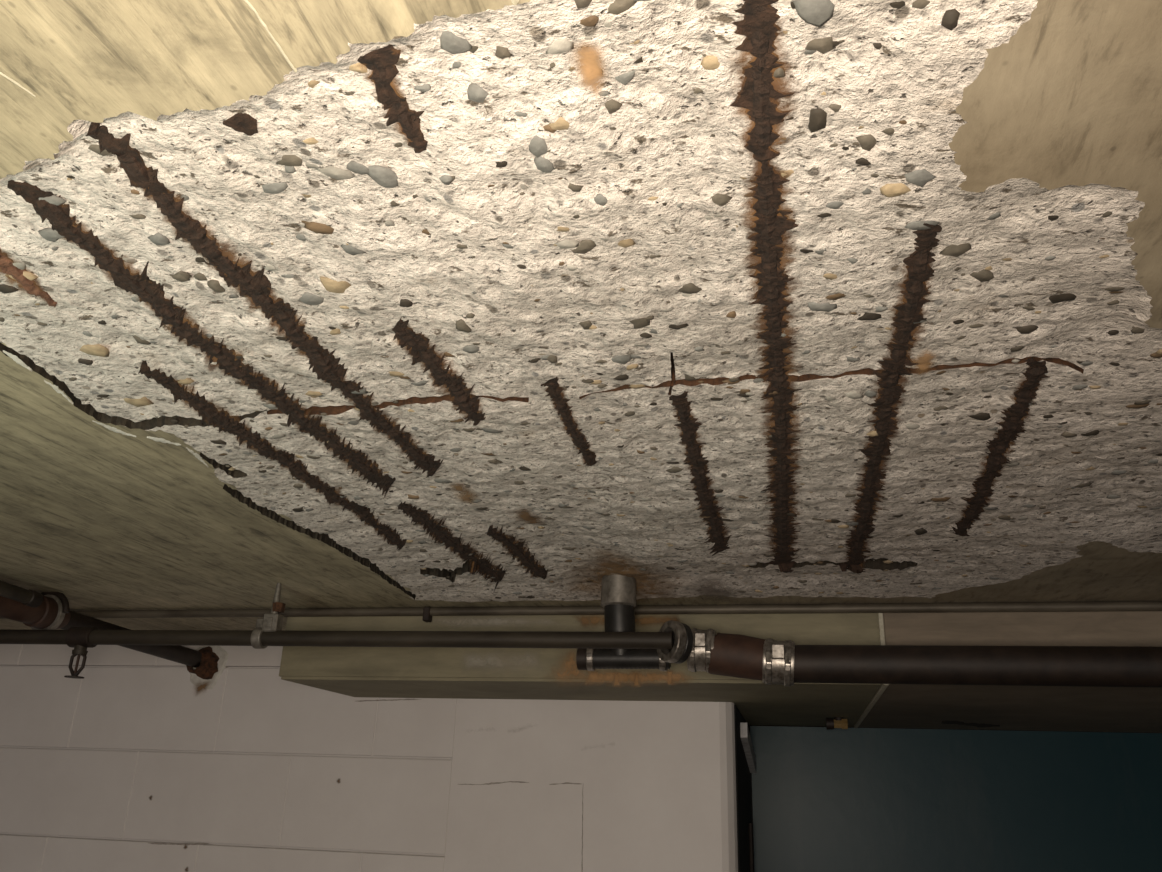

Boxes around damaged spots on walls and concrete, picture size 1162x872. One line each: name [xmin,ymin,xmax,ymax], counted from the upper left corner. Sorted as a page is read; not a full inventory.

corrosion [357,44,428,153]
corrosion [0,122,444,499]
crack [0,343,471,600]
corrosion [138,360,407,551]
corrosion [392,318,486,426]
crack [479,395,529,403]
spalling [0,0,1162,602]
corrosion [669,391,731,556]
crack [579,352,875,399]
corrosion [730,0,803,573]
corrosion [838,223,942,574]
crack [910,357,1084,374]